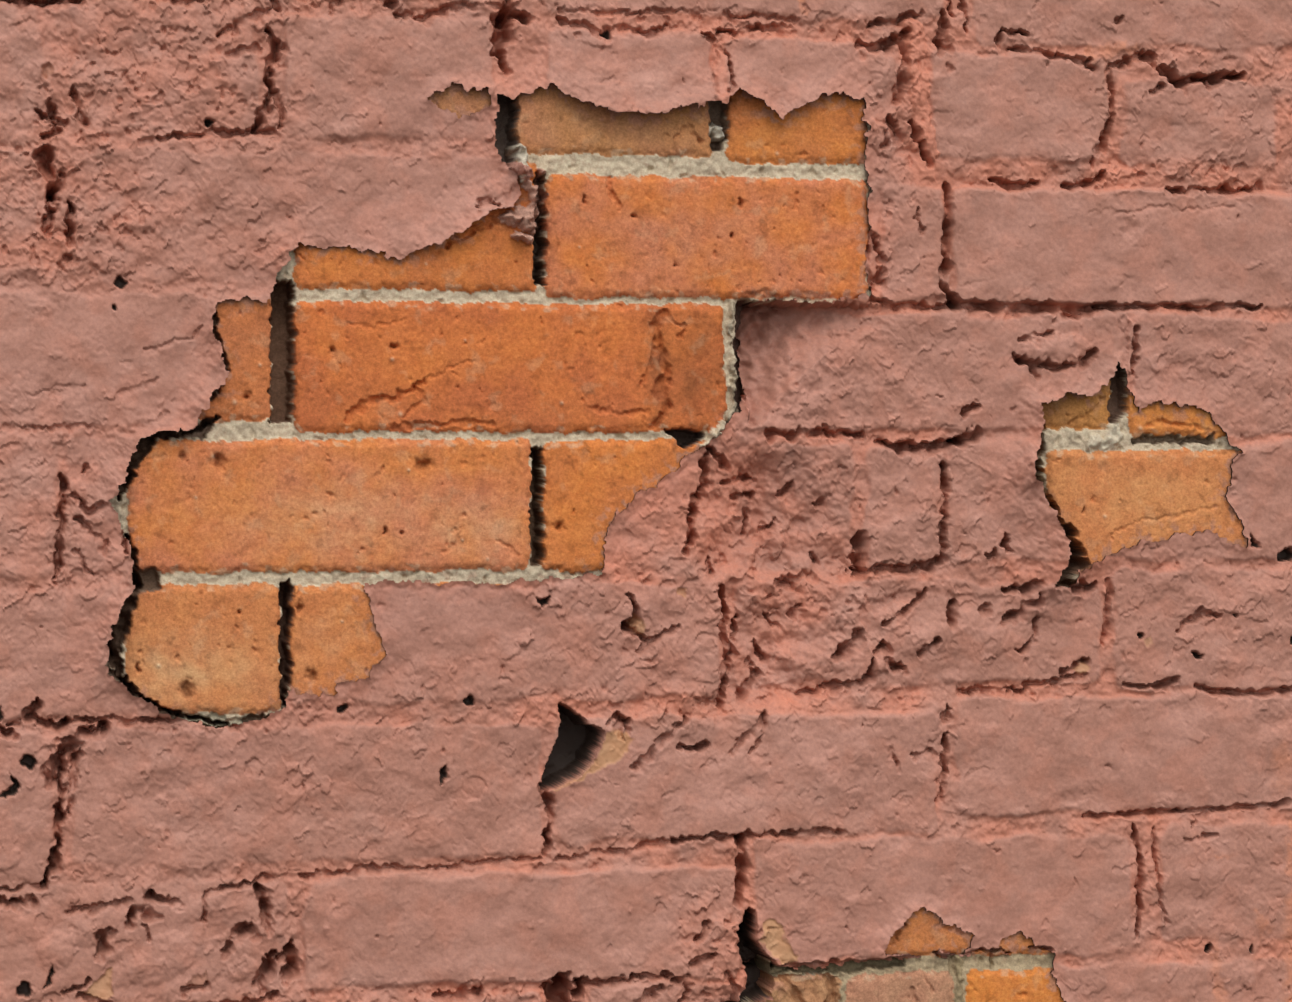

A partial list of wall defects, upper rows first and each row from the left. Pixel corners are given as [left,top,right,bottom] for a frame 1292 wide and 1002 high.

peeling [85,62,900,757]
peeling [1005,350,1248,611]
spalling [539,703,605,793]
spalling [629,716,711,771]
peeling [740,899,1066,1002]